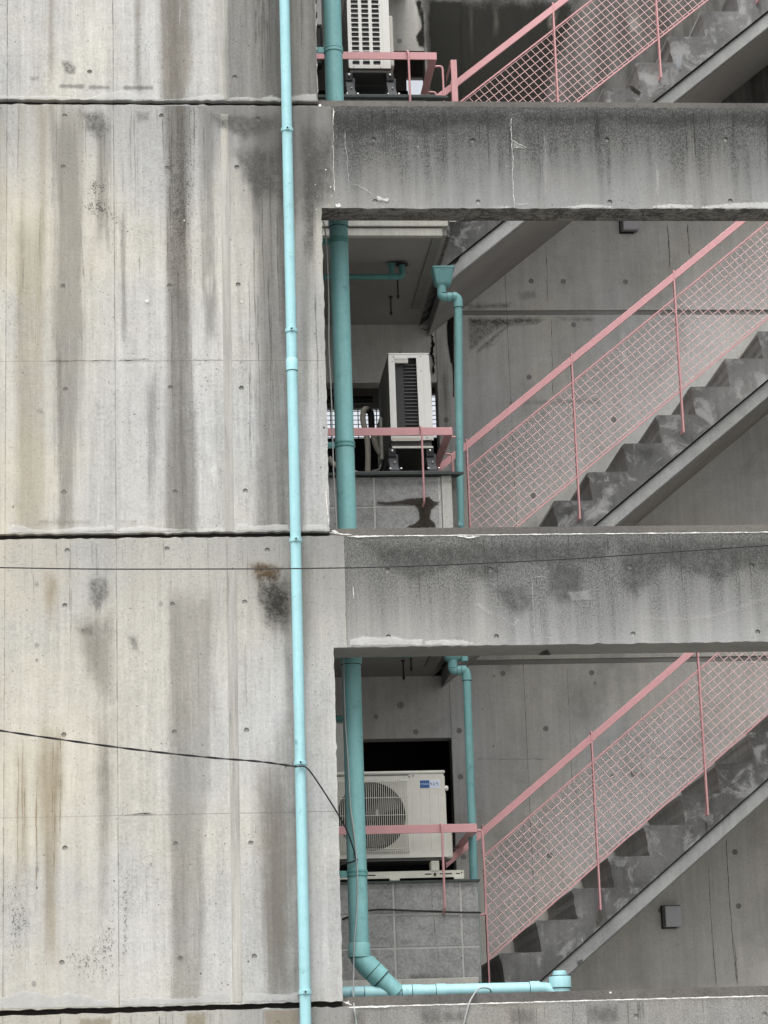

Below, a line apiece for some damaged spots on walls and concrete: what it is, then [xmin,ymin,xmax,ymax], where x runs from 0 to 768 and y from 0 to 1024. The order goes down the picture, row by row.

water stain [296,0,571,222]